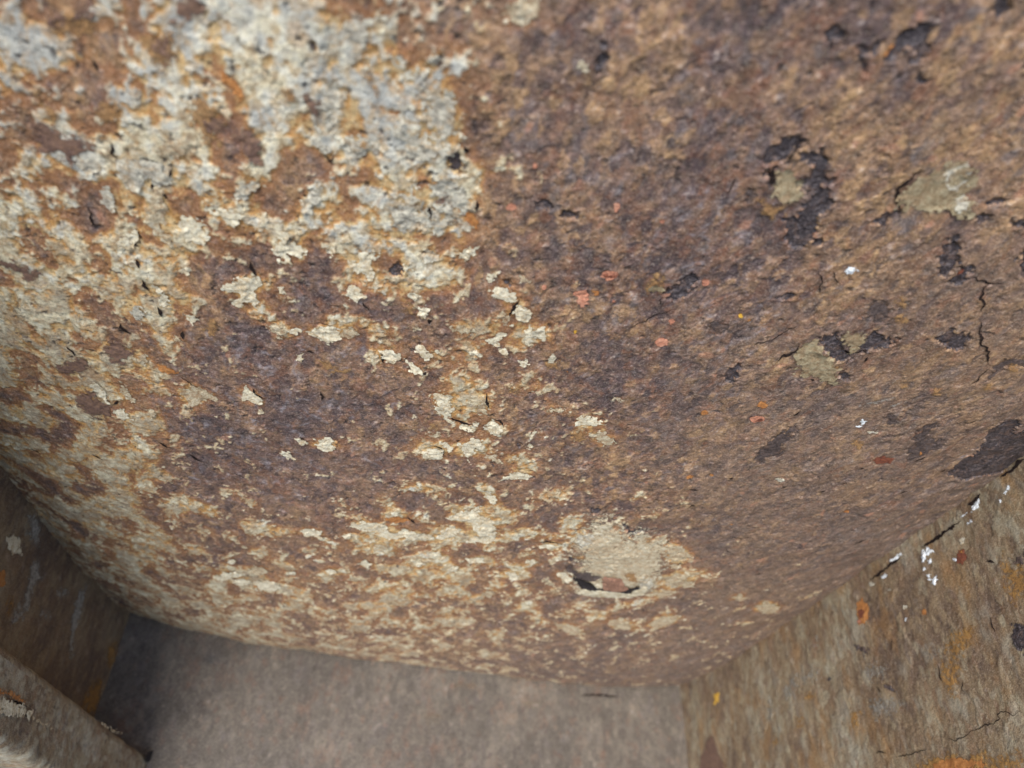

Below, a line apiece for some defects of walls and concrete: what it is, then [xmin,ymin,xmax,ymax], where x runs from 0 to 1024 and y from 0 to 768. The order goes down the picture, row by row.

corrosion [141,0,205,75]
corrosion [25,90,102,168]
corrosion [189,98,266,167]
peeling [308,8,479,236]
corrosion [0,259,43,282]
peeling [73,138,266,325]
spalling [745,135,835,250]
peeling [449,271,546,368]
crack [970,277,1008,384]
corrosion [55,347,114,421]
peeling [421,393,537,482]
peeling [343,491,500,572]